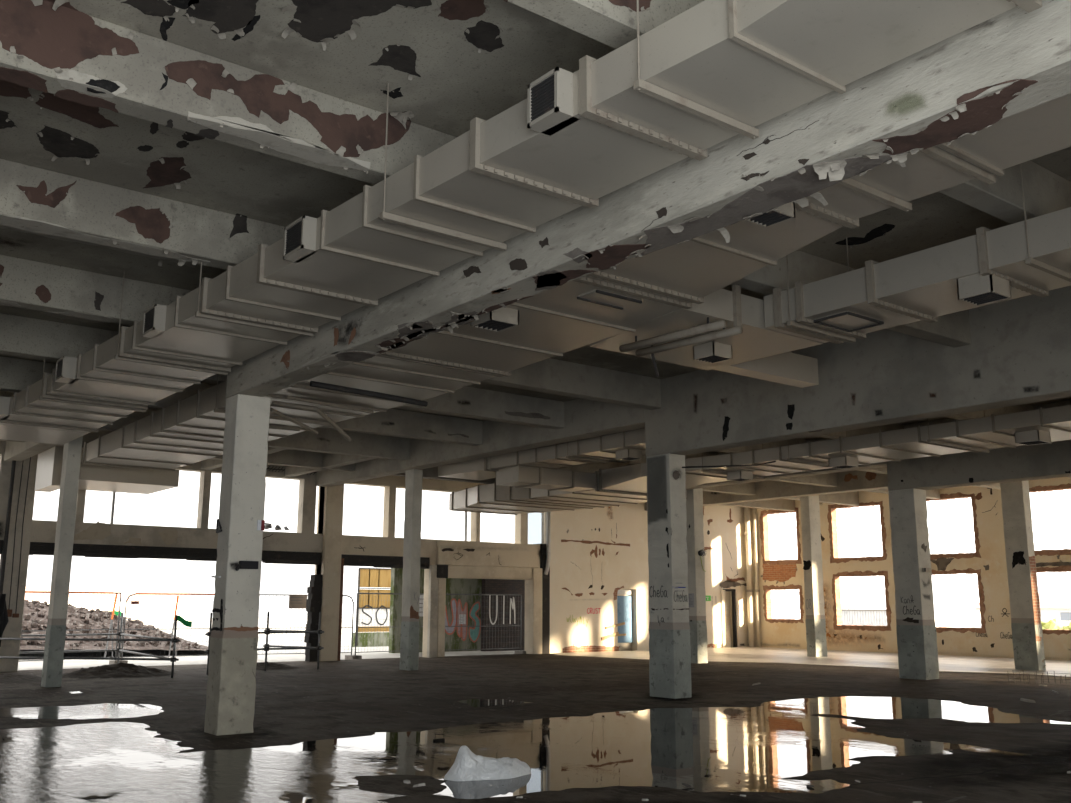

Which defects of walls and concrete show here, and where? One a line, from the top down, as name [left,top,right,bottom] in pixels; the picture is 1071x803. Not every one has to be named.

peeling [609,0,651,12]
peeling [0,0,139,130]
peeling [368,44,421,81]
peeling [36,125,100,165]
peeling [137,60,414,189]
peeling [16,180,77,208]
flaking render [0,204,210,268]
spalling [302,79,1038,370]
spalling [722,416,730,441]
flaking render [1029,471,1071,493]
flaking render [759,507,811,623]
flaking render [1012,549,1071,668]